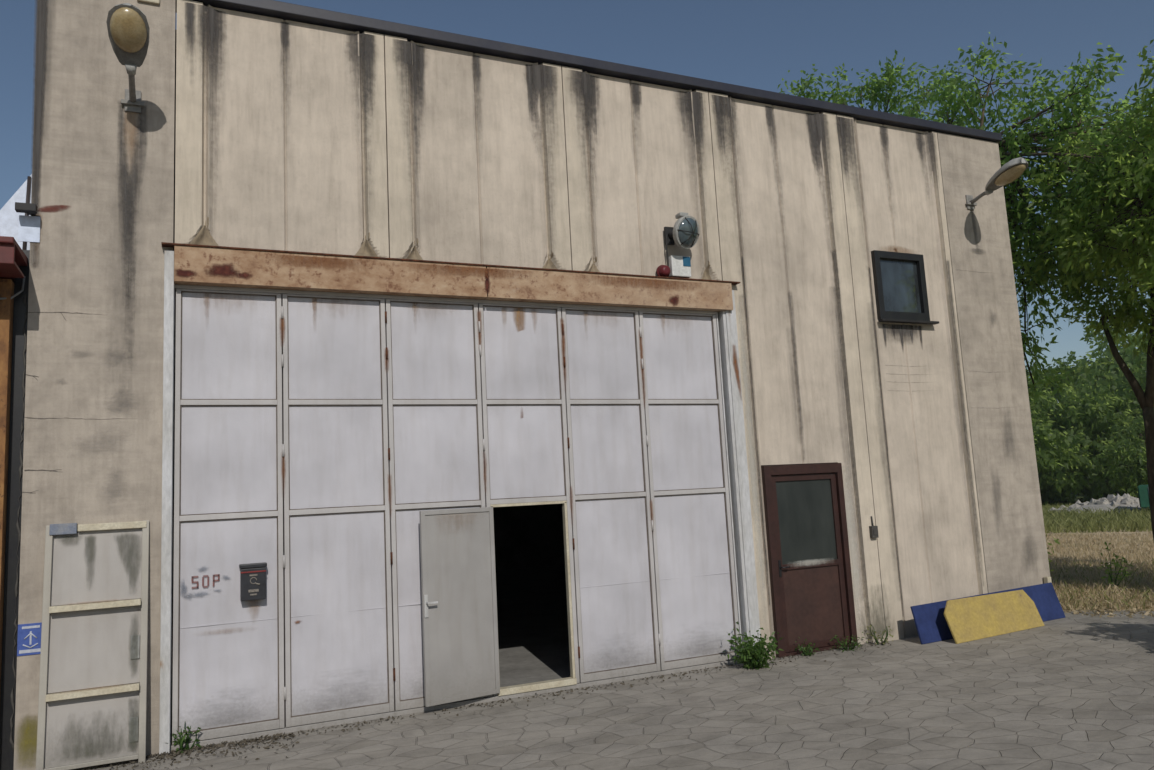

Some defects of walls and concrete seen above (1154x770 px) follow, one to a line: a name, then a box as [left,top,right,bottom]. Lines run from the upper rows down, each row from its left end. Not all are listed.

damp [32,0,47,216]
damp [349,33,373,98]
damp [397,39,423,99]
damp [526,64,554,113]
damp [572,70,595,124]
damp [631,82,640,105]
damp [680,91,736,147]
damp [766,106,774,136]
damp [807,113,854,171]
damp [120,107,146,279]
corrosion [209,264,251,279]
corrosion [441,265,503,292]